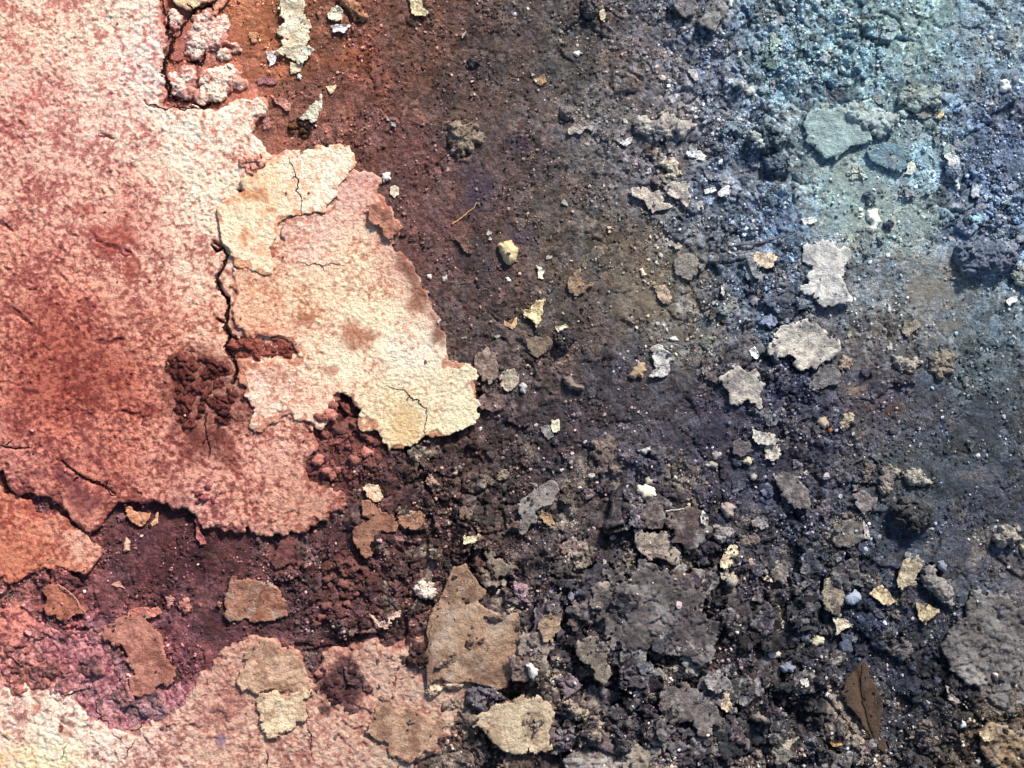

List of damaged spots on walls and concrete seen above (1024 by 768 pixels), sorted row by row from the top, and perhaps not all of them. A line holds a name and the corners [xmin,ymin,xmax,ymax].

crack [143,0,221,111]
crack [288,157,303,216]
crack [212,243,245,384]
peeling [164,84,519,629]
peeling [125,506,159,527]
peeling [43,580,87,622]
peeling [128,607,162,617]
flaking render [315,667,359,710]